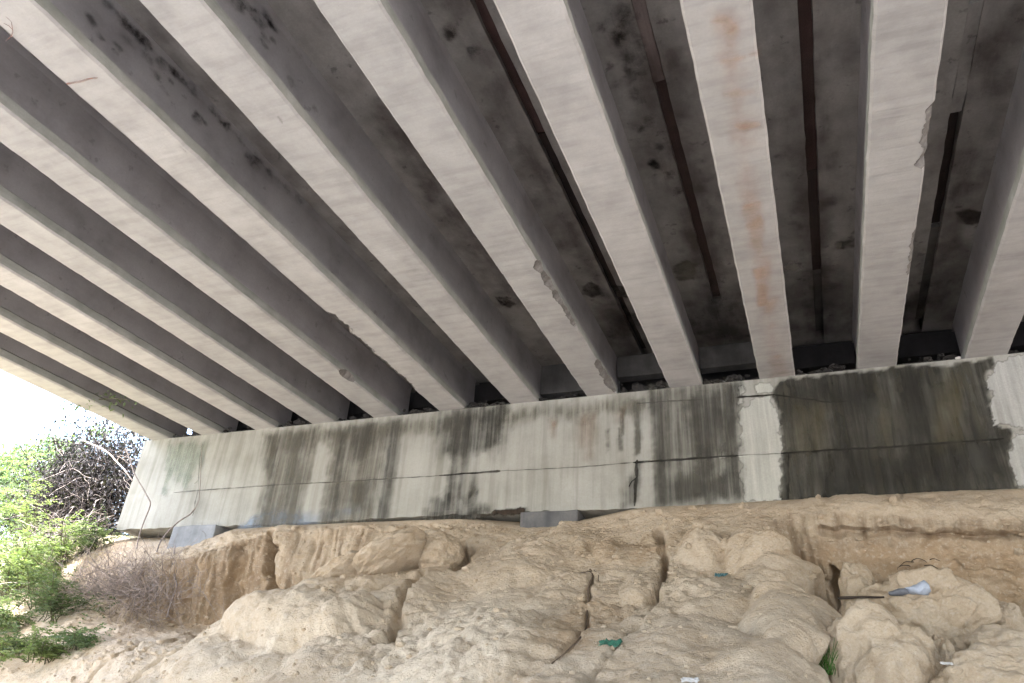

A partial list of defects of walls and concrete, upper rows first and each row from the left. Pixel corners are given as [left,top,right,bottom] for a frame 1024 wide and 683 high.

spalling [914,103,933,169]
spalling [533,260,576,326]
spalling [594,359,616,392]
water stain [245,406,536,526]
crack [174,455,742,514]
water stain [606,383,740,505]
crack [775,438,1004,500]
water stain [772,358,1018,500]
peeling [986,354,1024,486]